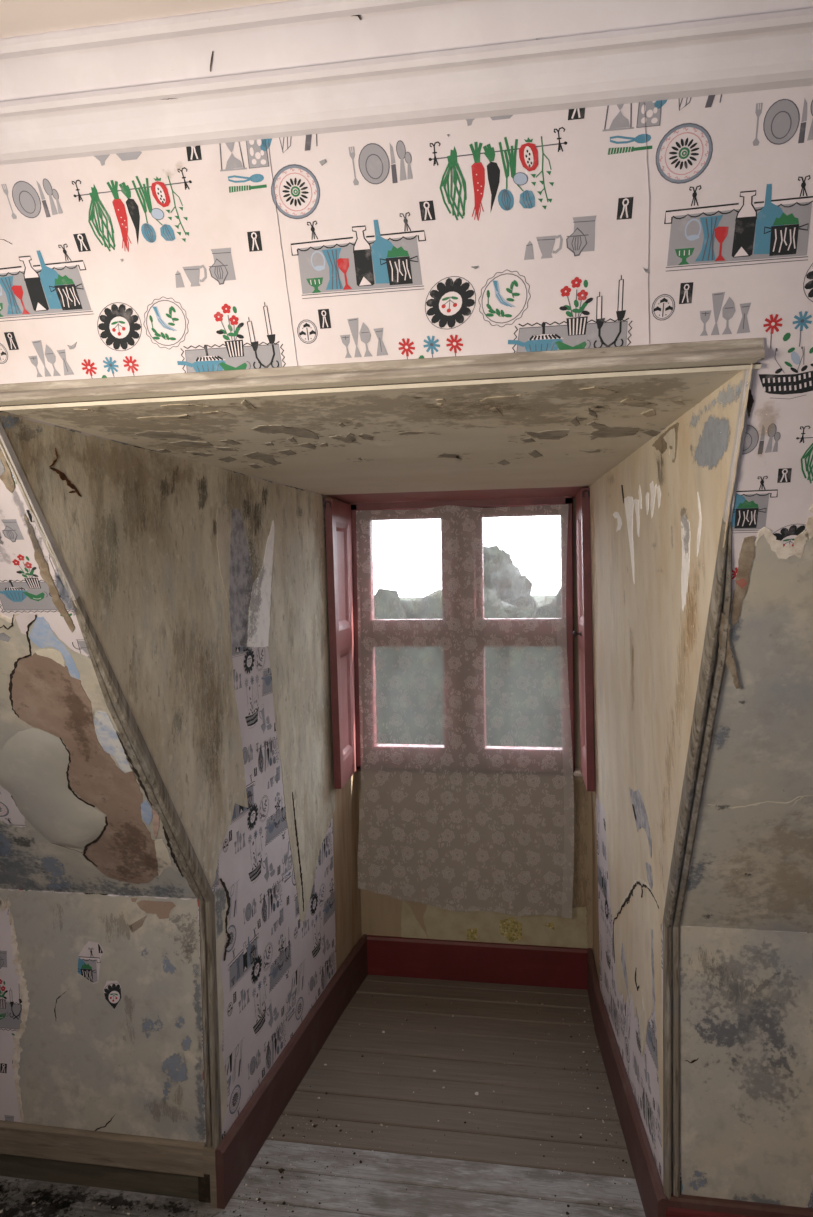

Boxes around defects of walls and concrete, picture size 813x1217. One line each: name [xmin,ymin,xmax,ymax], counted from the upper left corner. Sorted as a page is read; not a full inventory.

crack [49,448,82,497]
peeling [74,400,440,469]
peeling [613,481,661,584]
peeling [681,492,702,611]
peeling [731,536,755,626]
spalling [0,514,175,932]
peeling [629,788,653,889]
crack [613,878,659,963]